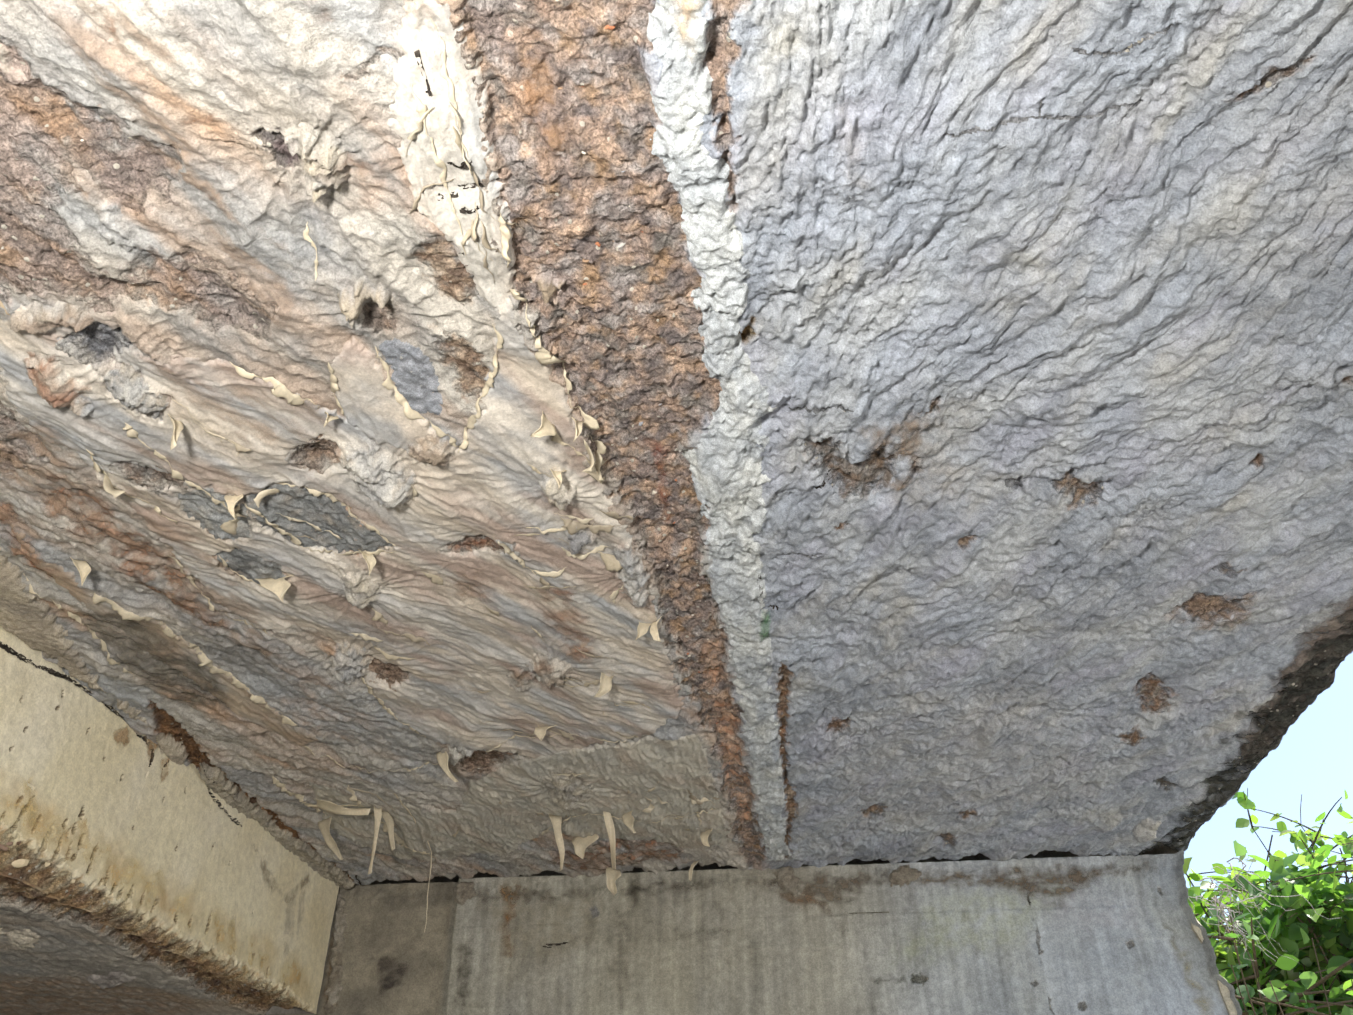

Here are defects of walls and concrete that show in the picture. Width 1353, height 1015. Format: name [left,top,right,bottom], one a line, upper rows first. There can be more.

peeling [0,0,767,932]
spalling [803,437,921,502]
spalling [1176,592,1246,620]
spalling [1212,562,1243,578]
crack [0,641,242,827]
rust [714,700,754,821]
spalling [774,662,798,859]
spalling [1117,727,1145,746]
spalling [1135,671,1176,715]
damp [1240,596,1353,759]